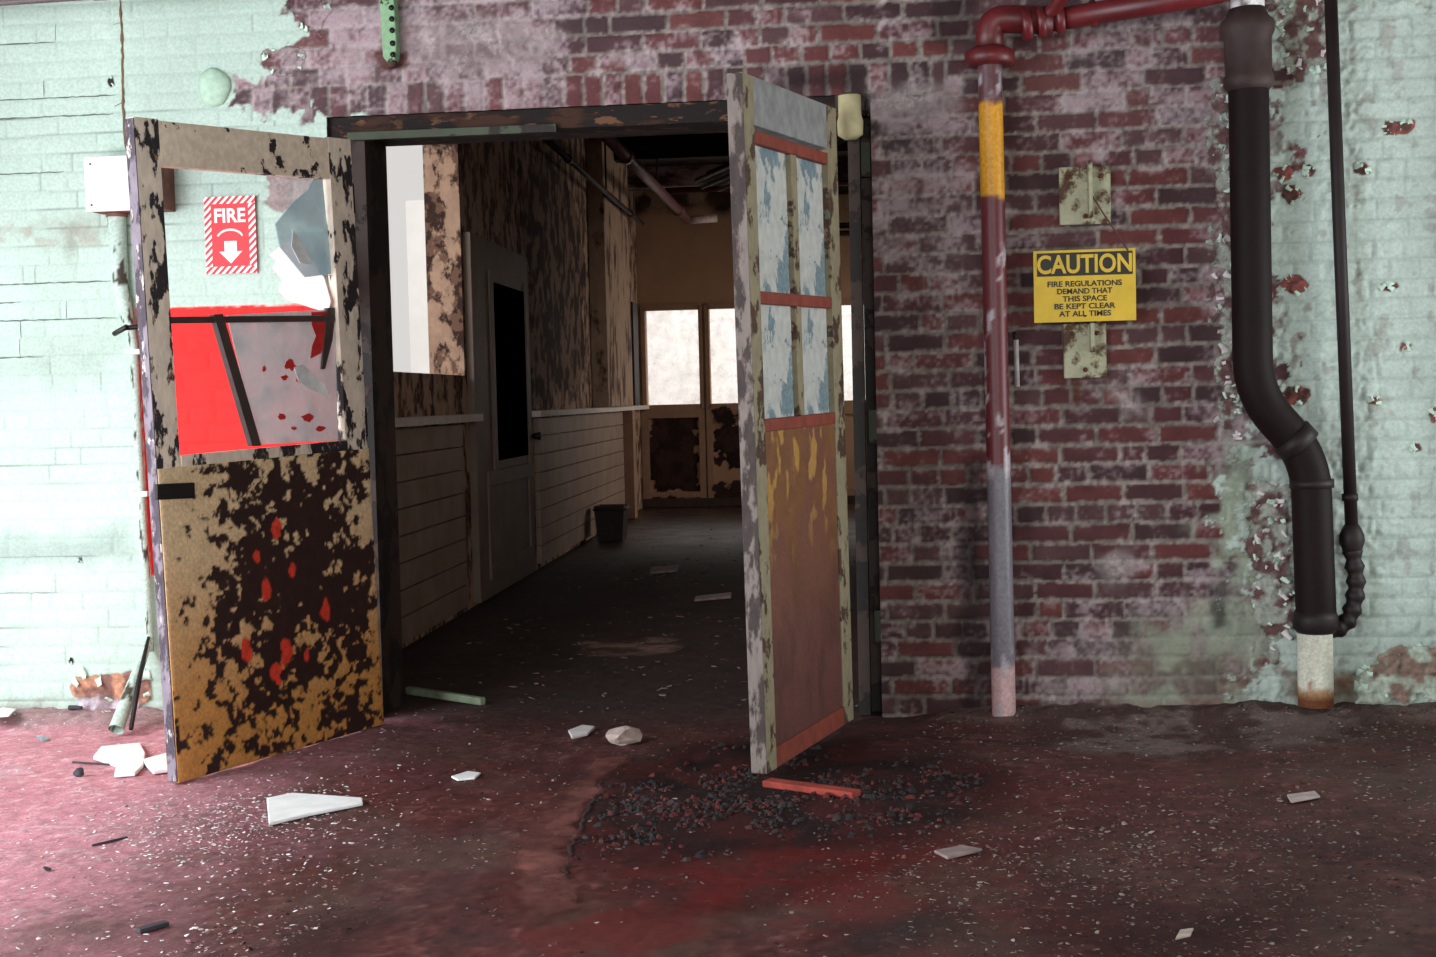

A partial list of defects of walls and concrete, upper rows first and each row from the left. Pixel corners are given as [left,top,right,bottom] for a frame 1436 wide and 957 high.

peeling [288,0,333,39]
peeling [1273,0,1327,82]
peeling [261,46,305,77]
peeling [1382,118,1415,135]
peeling [1354,161,1372,175]
peeling [1272,164,1316,205]
peeling [1281,274,1309,297]
peeling [1377,281,1399,293]
peeling [1282,385,1311,406]
peeling [1244,480,1295,665]
spalling [68,657,152,711]
peeling [1353,664,1373,691]